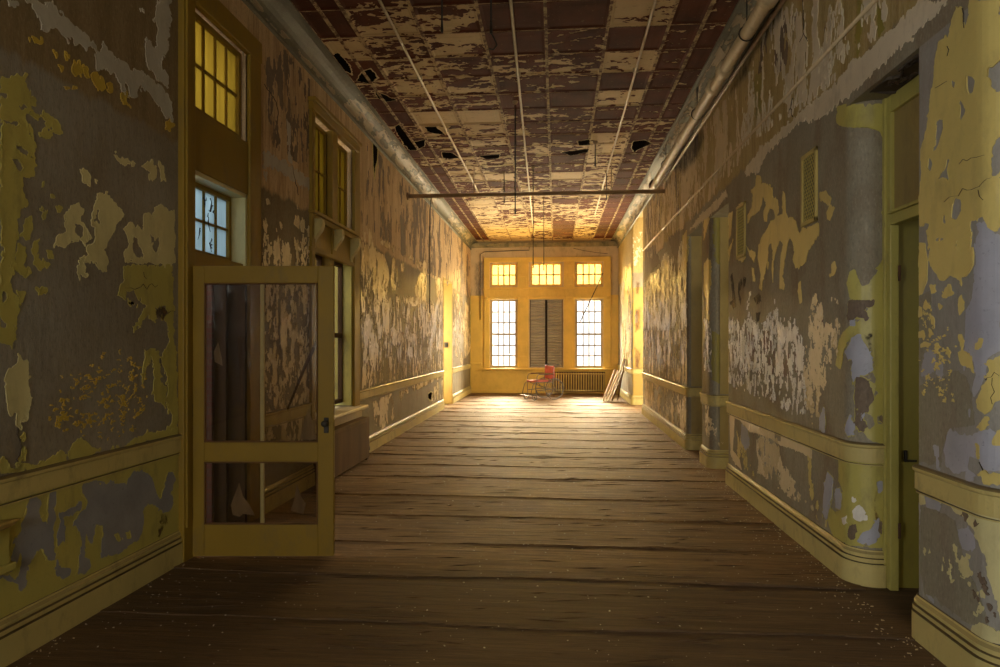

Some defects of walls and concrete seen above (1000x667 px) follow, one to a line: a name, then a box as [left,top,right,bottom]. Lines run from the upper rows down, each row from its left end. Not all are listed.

peeling [7,0,175,132]
flaking render [264,49,310,167]
peeling [0,72,179,474]
peeling [262,204,309,266]
peeling [344,95,473,430]
peeling [614,0,1000,486]
peeling [265,285,310,441]
flaking render [0,468,176,593]
peeling [705,405,883,548]
flaking render [919,494,1000,644]